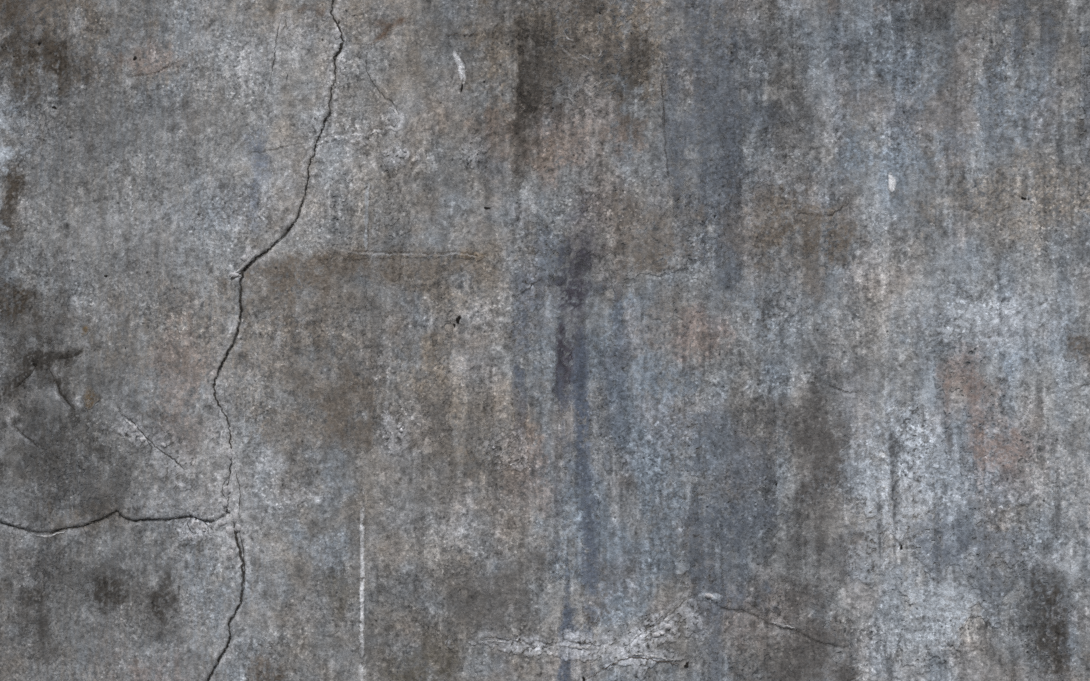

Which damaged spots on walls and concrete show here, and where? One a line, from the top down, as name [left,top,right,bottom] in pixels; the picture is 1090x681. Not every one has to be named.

crack [0,0,399,681]
leakage [218,0,877,681]